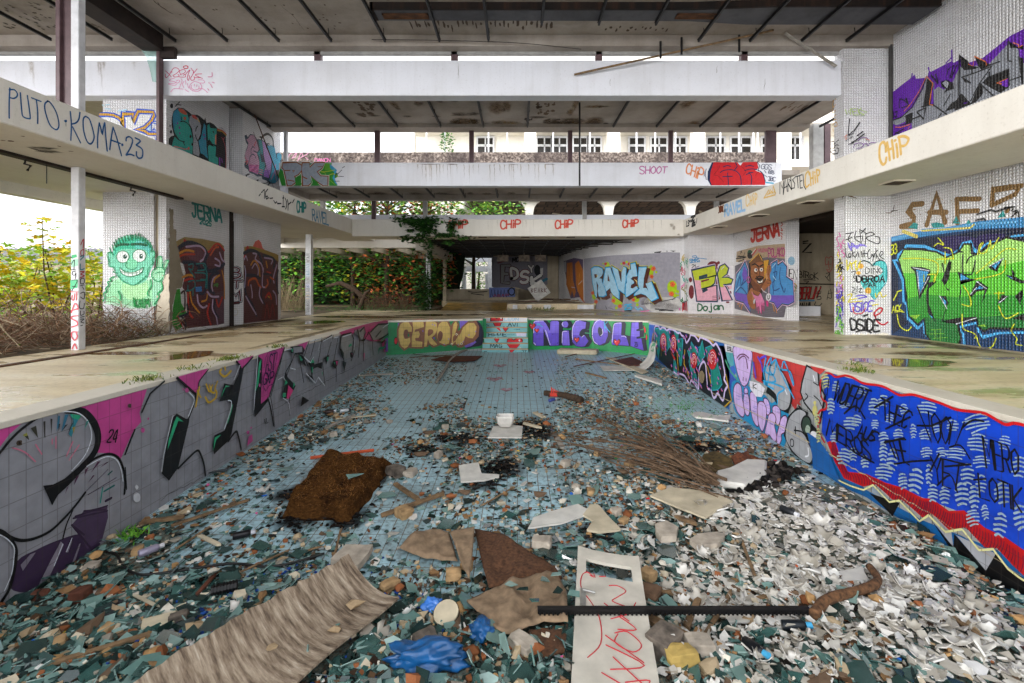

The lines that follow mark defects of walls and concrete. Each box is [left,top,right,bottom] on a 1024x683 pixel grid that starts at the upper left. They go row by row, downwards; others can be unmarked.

water stain [439,101,477,124]
water stain [532,101,606,124]